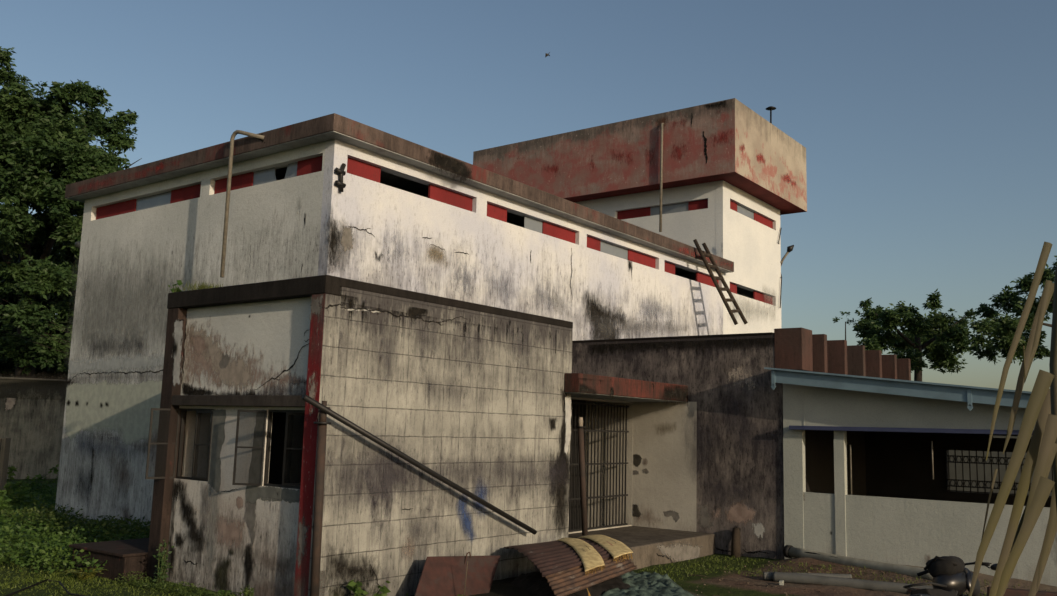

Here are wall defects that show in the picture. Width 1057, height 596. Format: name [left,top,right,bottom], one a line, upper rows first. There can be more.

crack [691,113,708,163]
damp [328,217,346,266]
damp [84,276,173,350]
crack [72,319,187,384]
peeling [172,319,316,412]
crack [254,304,466,390]
damp [550,391,570,532]
peeling [633,454,649,475]
damp [168,481,206,575]
damp [244,545,289,596]
damp [326,553,376,585]
damp [657,542,702,562]